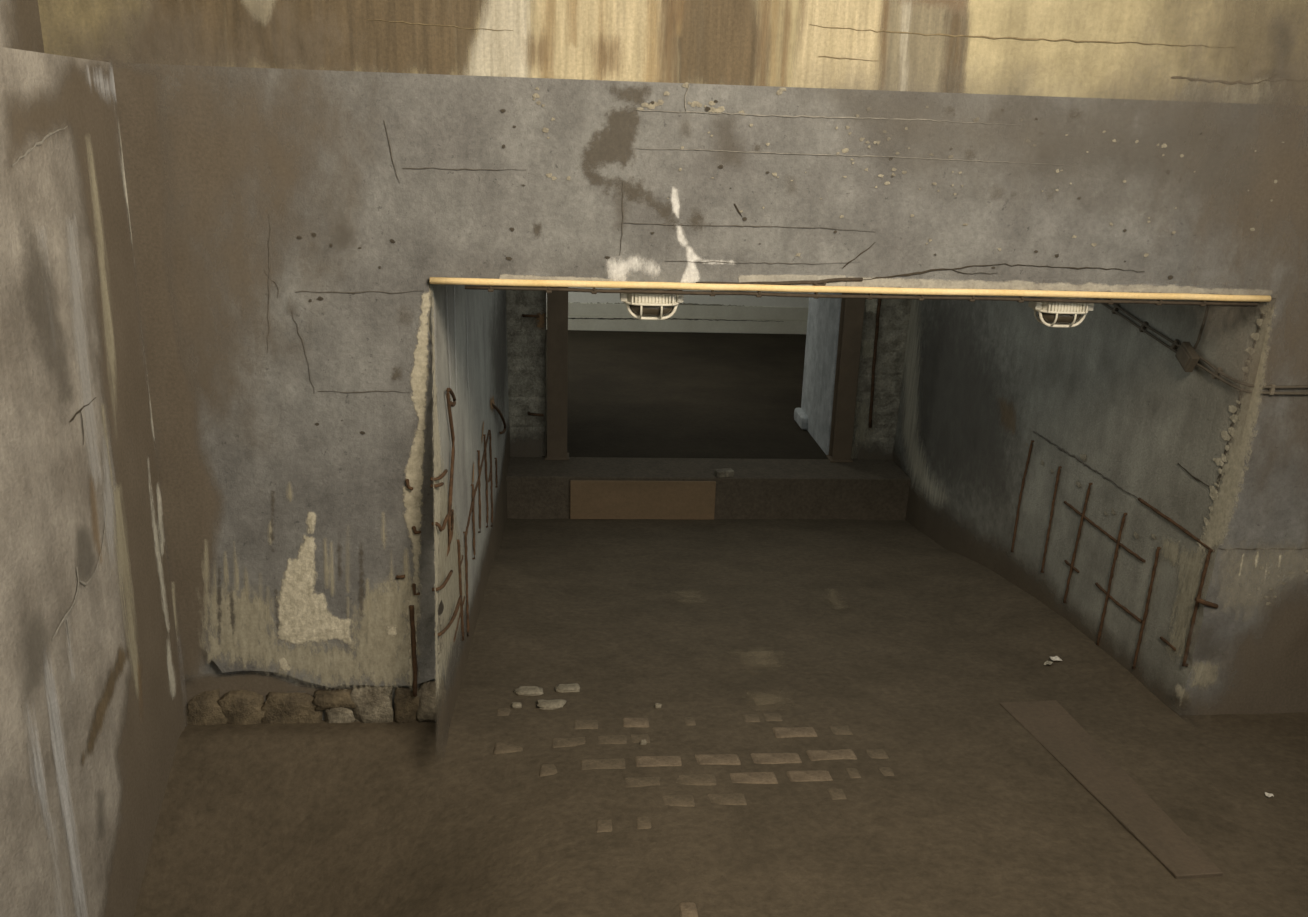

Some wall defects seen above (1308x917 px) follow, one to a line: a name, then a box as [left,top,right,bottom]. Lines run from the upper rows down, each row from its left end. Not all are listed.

flaking render [200,293,506,697]
water stain [8,0,770,917]
crack [843,244,1145,280]
spalling [846,267,1275,703]